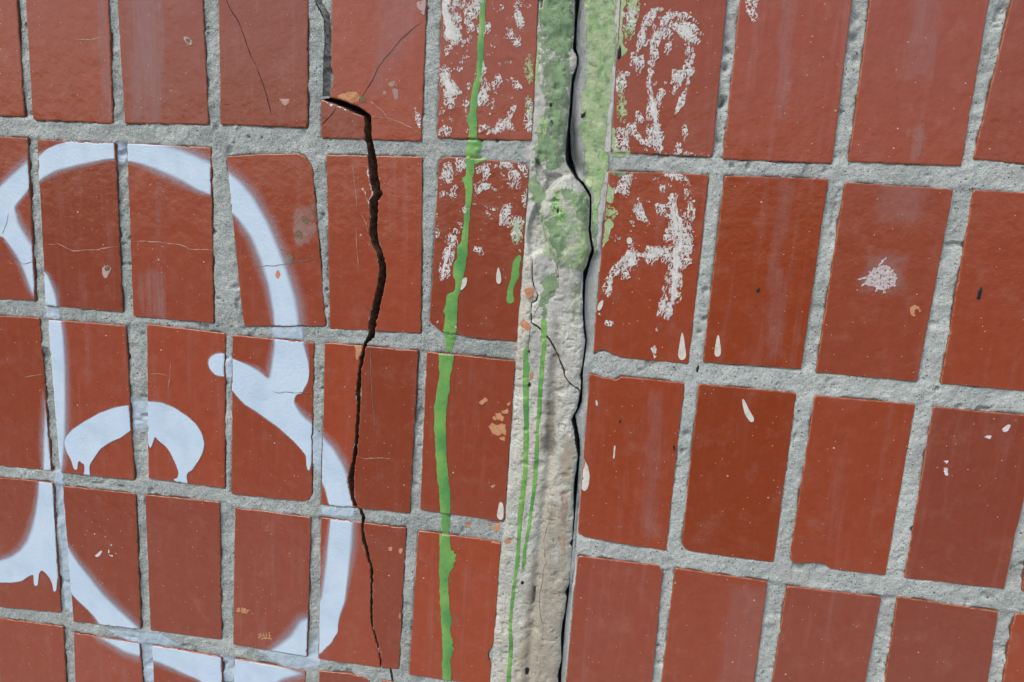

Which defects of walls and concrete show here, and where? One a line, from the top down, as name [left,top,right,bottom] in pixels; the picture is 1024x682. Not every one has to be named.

crack [315,0,421,681]
crack [528,0,594,682]